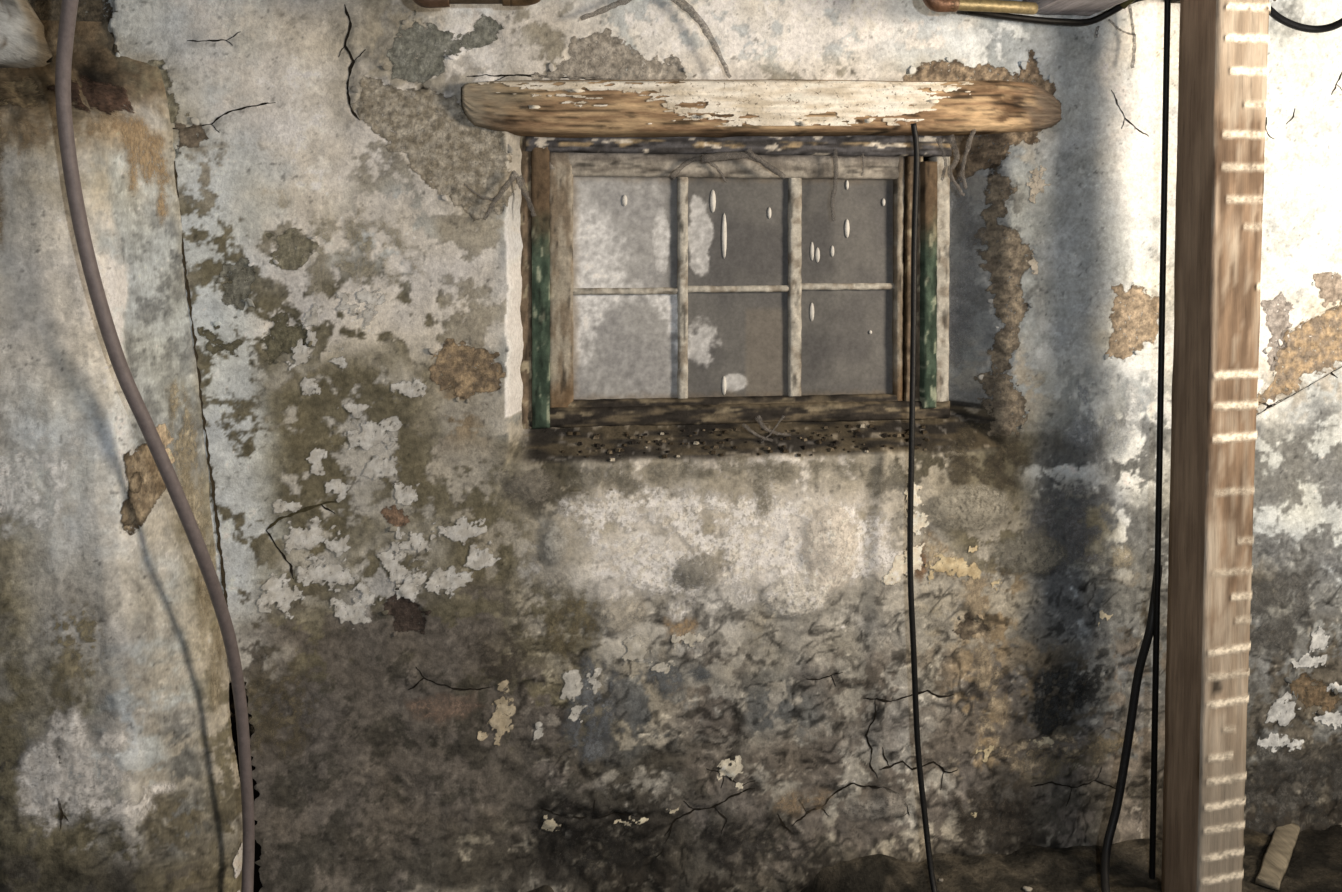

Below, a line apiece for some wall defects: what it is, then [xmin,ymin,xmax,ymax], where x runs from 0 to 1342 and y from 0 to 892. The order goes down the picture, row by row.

crack [339,4,366,121]
flaking render [350,10,517,221]
peeling [476,28,1061,127]
crack [174,161,228,607]
flaking render [1256,272,1342,413]
water stain [0,438,72,535]
crack [266,501,336,579]
peeling [256,402,501,637]
crack [229,682,263,892]
crack [777,672,958,834]
water stain [1031,665,1111,736]
peeling [1257,626,1342,753]